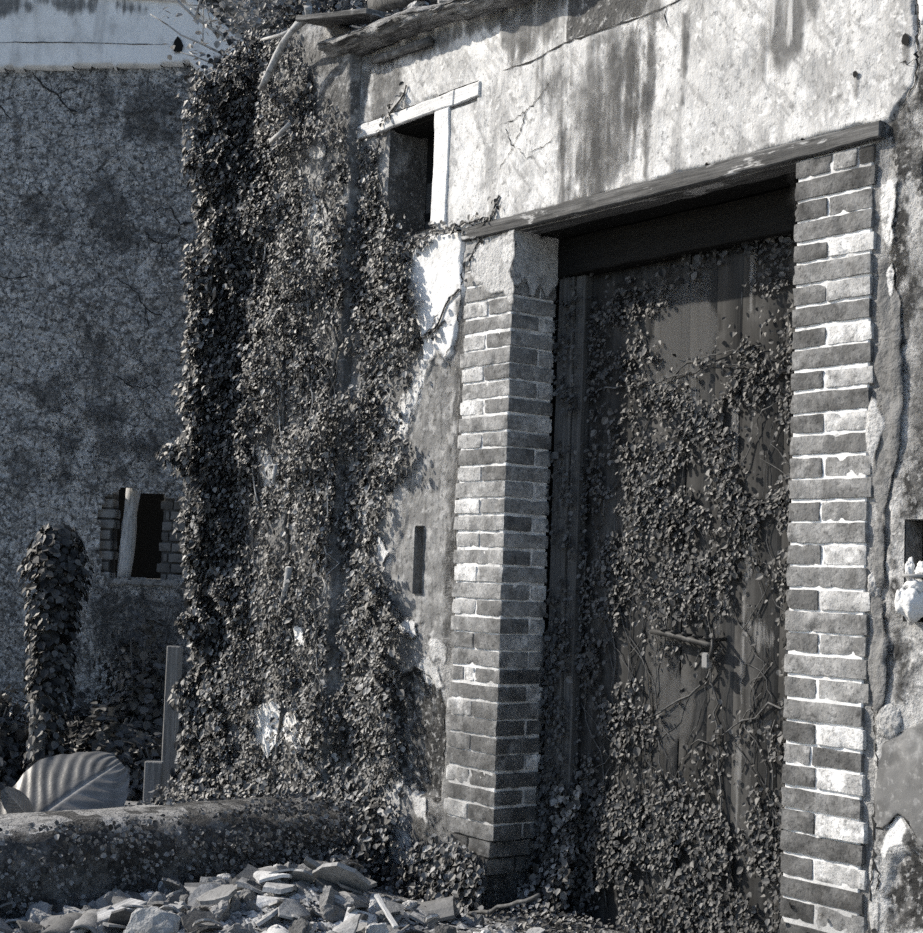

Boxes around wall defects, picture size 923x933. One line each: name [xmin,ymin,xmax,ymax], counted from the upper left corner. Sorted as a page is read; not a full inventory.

damp [560,119,569,200]
crack [505,0,679,70]
damp [573,0,659,195]
damp [761,0,816,72]
damp [888,41,923,195]
crack [897,0,919,113]
peeling [470,229,560,303]
damp [885,196,923,348]
damp [898,391,923,517]
spalling [357,349,461,867]
peeling [881,817,909,858]
peeling [869,902,878,929]